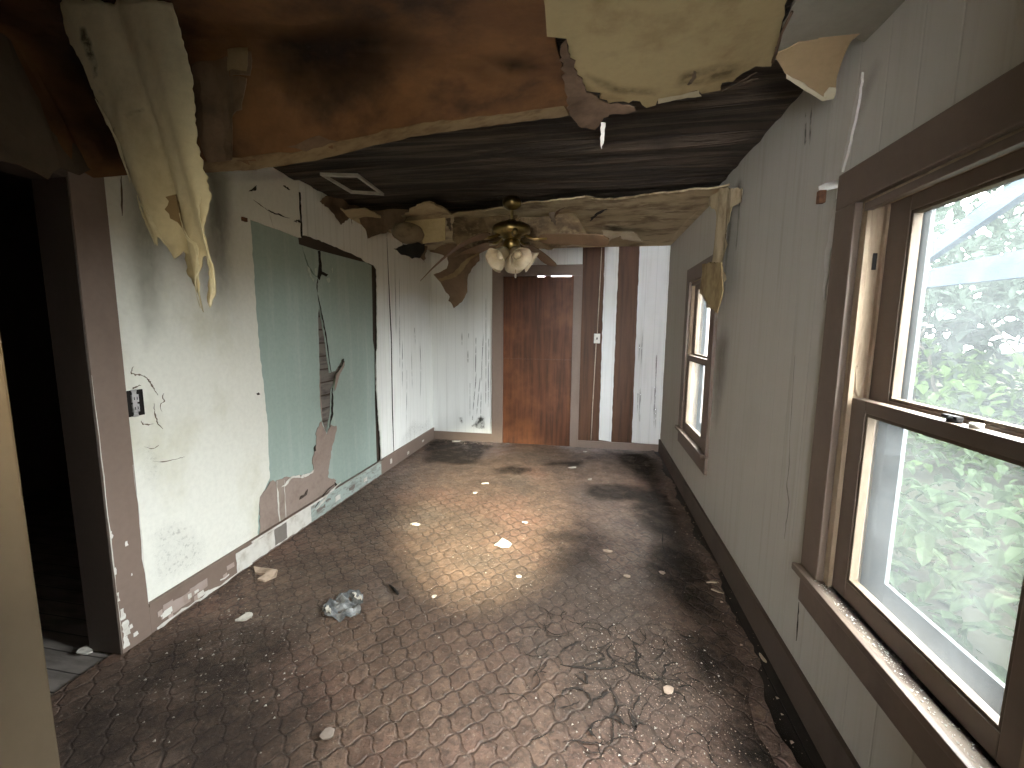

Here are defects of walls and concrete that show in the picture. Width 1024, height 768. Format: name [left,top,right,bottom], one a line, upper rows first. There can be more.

water stain [0,0,98,102]
water stain [266,28,383,77]
peeling [602,230,644,242]
peeling [92,381,139,649]
crack [131,367,183,462]
peeling [131,421,392,630]
water stain [425,439,492,464]
water stain [501,466,529,474]
water stain [589,454,725,639]
water stain [72,645,304,768]
crack [500,606,721,768]
water stain [732,701,780,768]